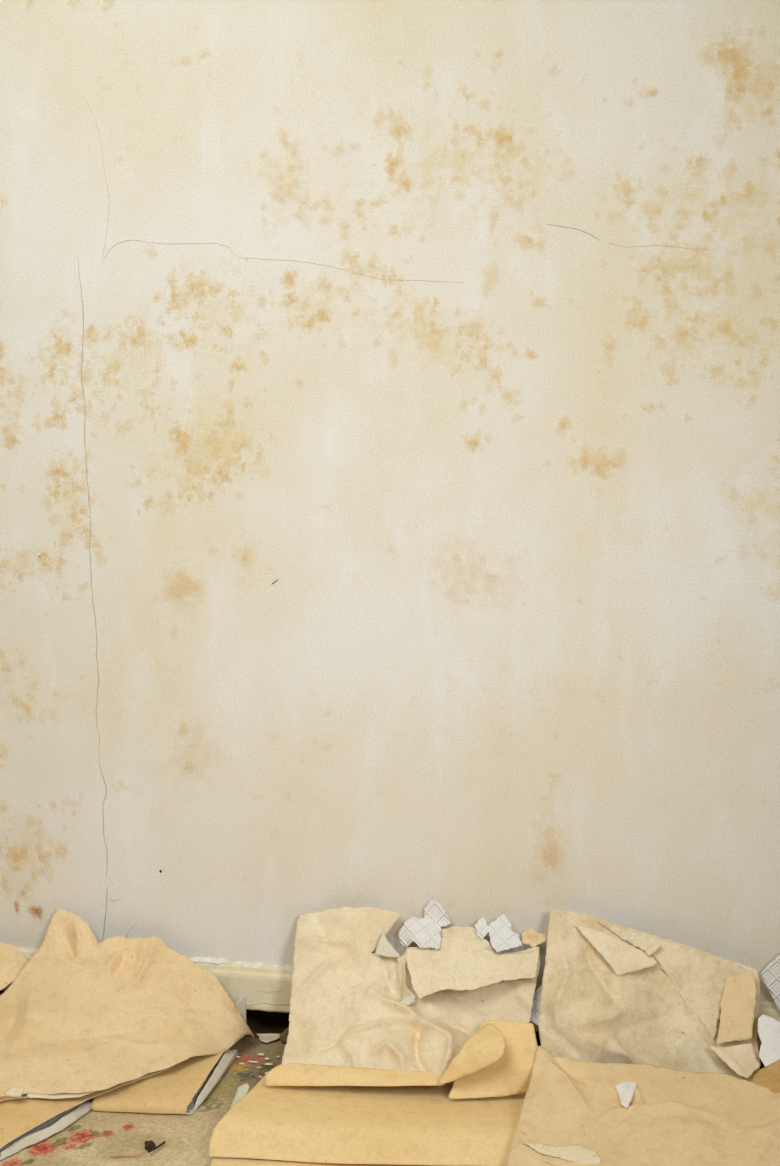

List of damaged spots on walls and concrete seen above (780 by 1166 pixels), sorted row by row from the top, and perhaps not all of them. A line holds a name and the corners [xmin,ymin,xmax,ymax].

crack [77,98,449,941]